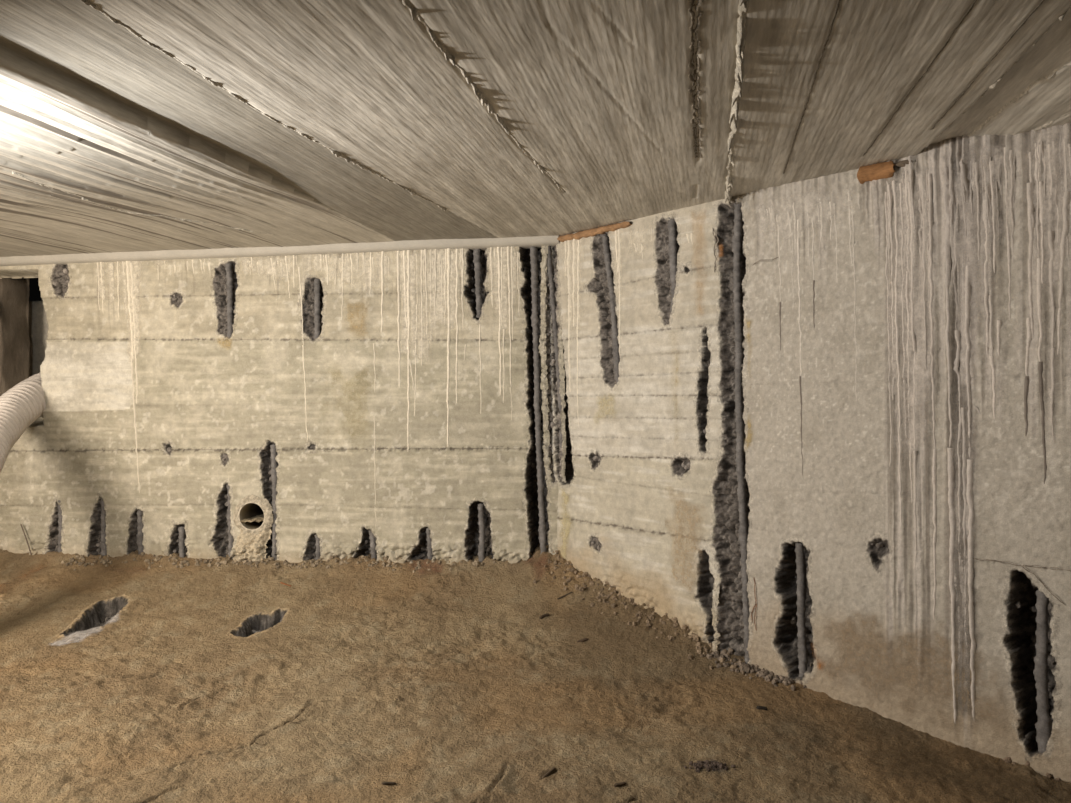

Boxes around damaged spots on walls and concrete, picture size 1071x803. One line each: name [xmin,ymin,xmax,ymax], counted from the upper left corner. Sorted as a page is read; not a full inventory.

crack [688,0,703,158]
crack [783,0,840,174]
crack [862,0,977,157]
crack [931,0,1044,130]
leakage [314,248,482,451]
leakage [489,246,520,420]
spalling [516,245,605,561]
leakage [564,239,580,405]
spalling [668,196,754,664]
leakage [828,139,1071,724]
spalling [770,536,820,684]
spalling [998,565,1064,762]